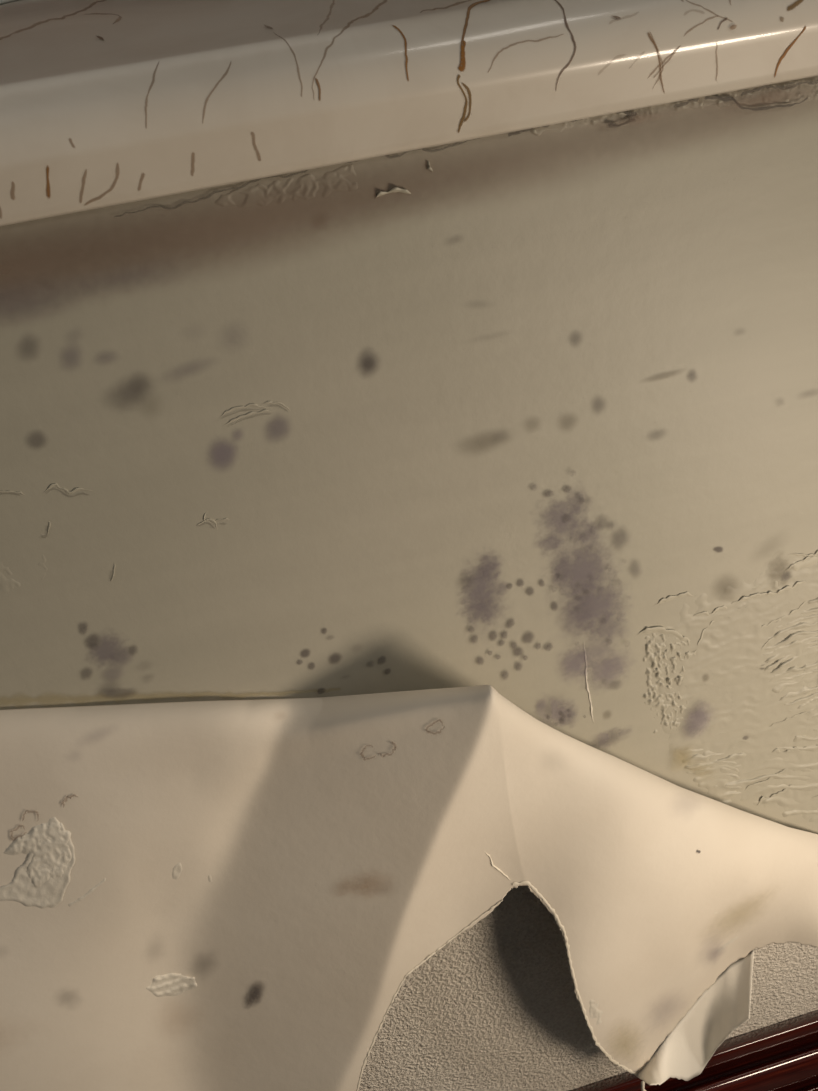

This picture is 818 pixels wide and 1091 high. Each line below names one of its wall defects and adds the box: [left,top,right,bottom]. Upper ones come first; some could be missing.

crack [393,25,409,81]
crack [457,0,489,133]
crack [555,0,576,89]
crack [648,33,664,92]
crack [774,0,806,77]
peeling [638,551,818,734]
peeling [0,685,818,1091]